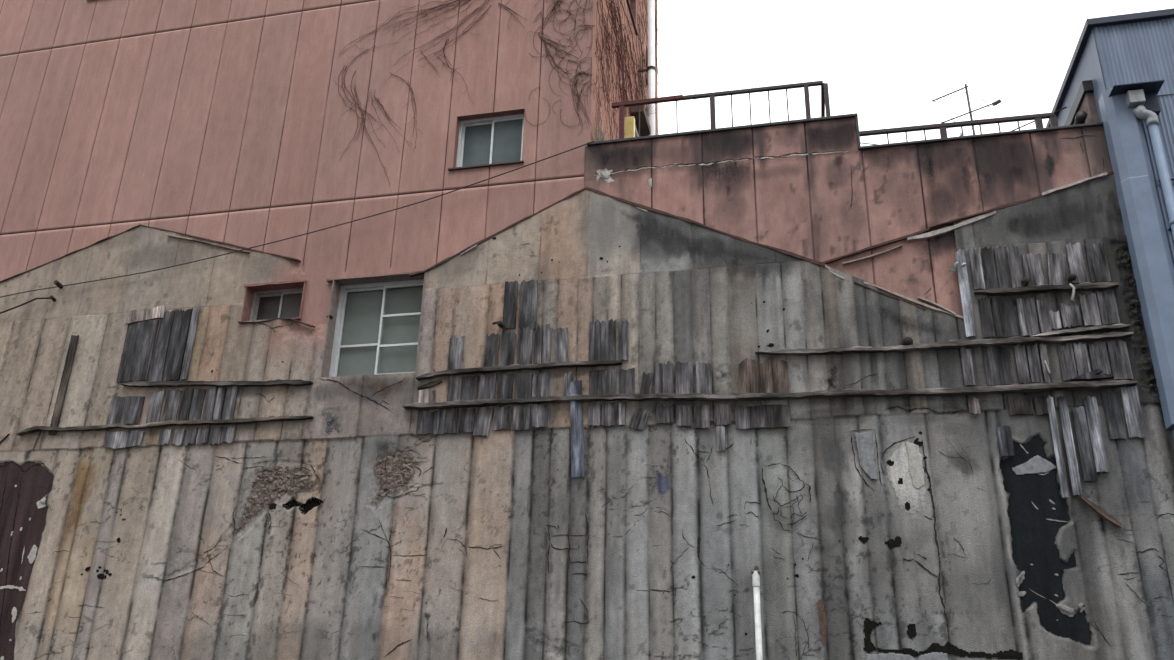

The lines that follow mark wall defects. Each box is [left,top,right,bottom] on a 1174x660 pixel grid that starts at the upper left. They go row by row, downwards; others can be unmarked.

crack [594,150,854,211]
water stain [927,230,955,246]
spalling [225,462,320,541]
spalling [371,447,433,503]
peeling [0,461,54,660]
peeling [999,435,1092,645]
peeling [866,642,1023,660]